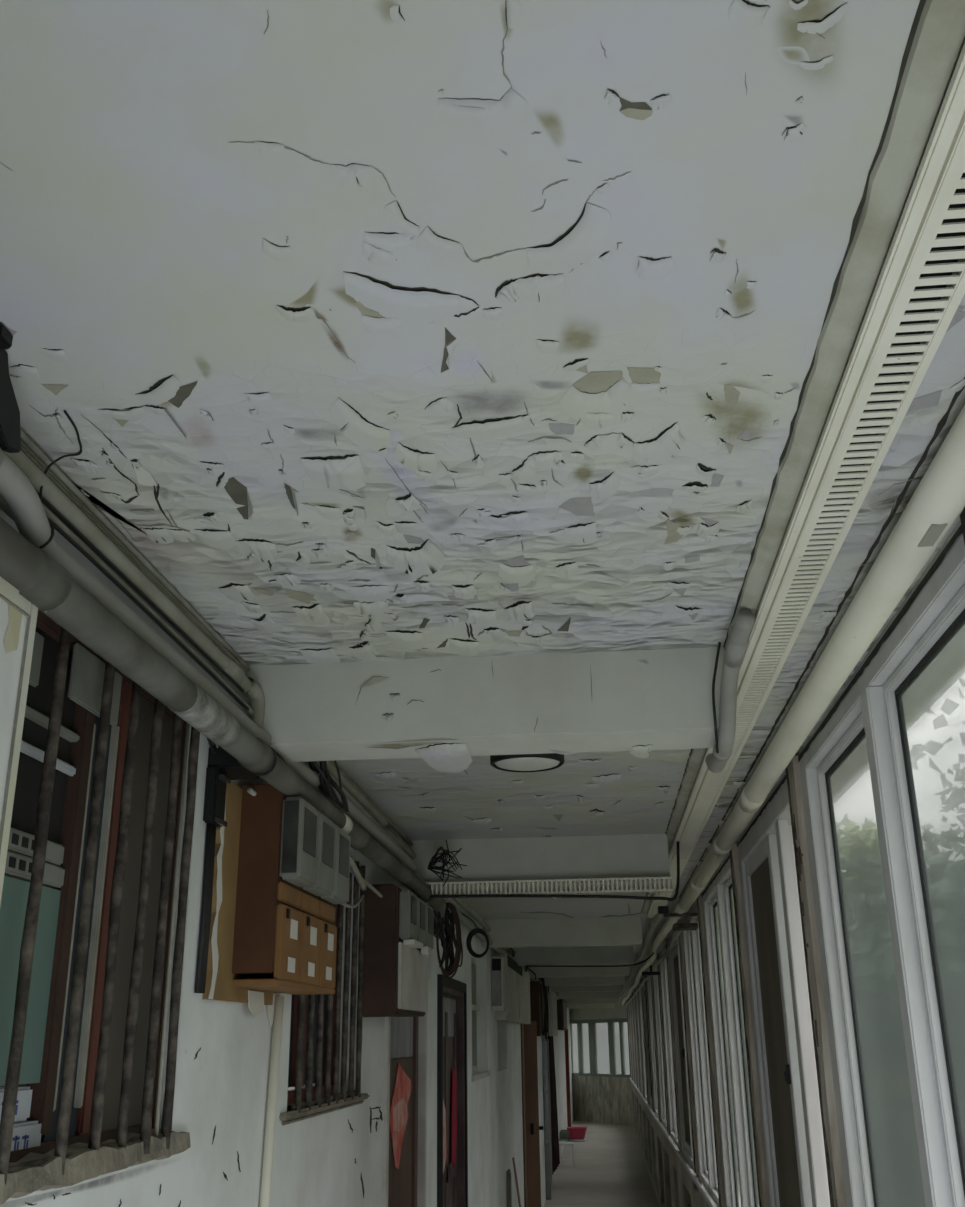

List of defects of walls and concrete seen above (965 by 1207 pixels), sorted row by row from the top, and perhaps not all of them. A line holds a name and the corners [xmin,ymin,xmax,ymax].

leakage [729,0,856,109]
crack [229,141,509,263]
peeling [710,236,760,325]
peeling [946,306,965,332]
peeling [907,379,965,412]
peeling [9,348,253,582]
peeling [682,463,753,513]
peeling [859,465,930,525]
spalling [637,505,719,620]
peeling [840,556,878,576]
spalling [3,604,22,653]
peeling [351,740,472,773]